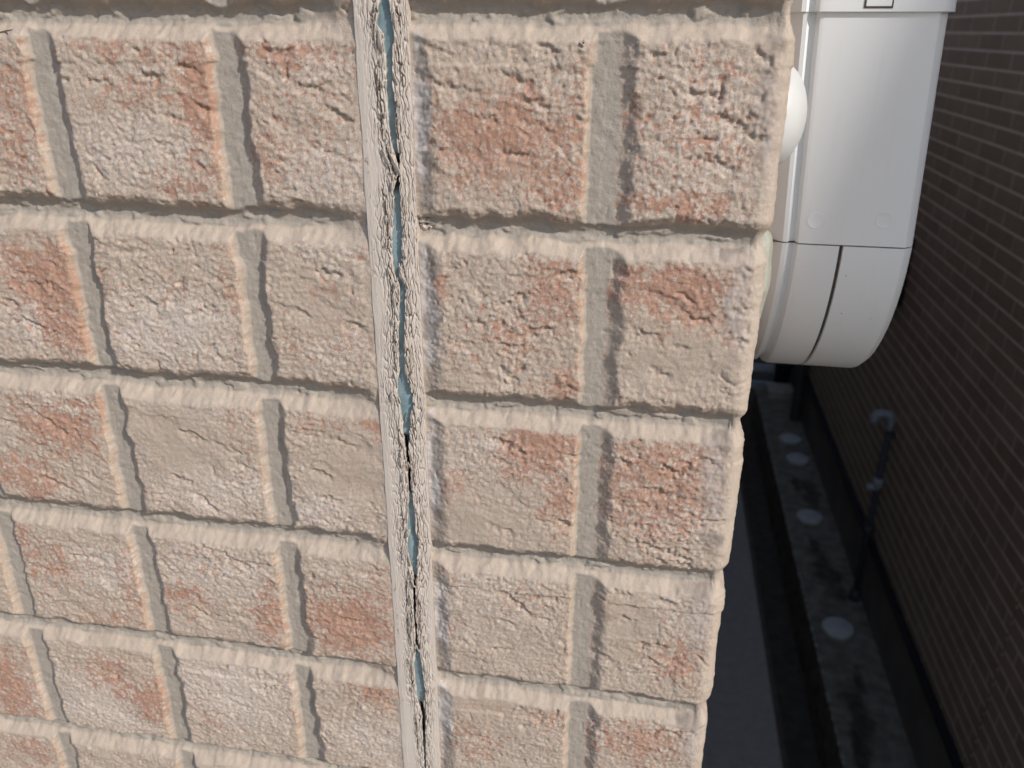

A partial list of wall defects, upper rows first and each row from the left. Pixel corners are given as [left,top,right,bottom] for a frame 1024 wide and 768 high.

crack [371,0,430,768]